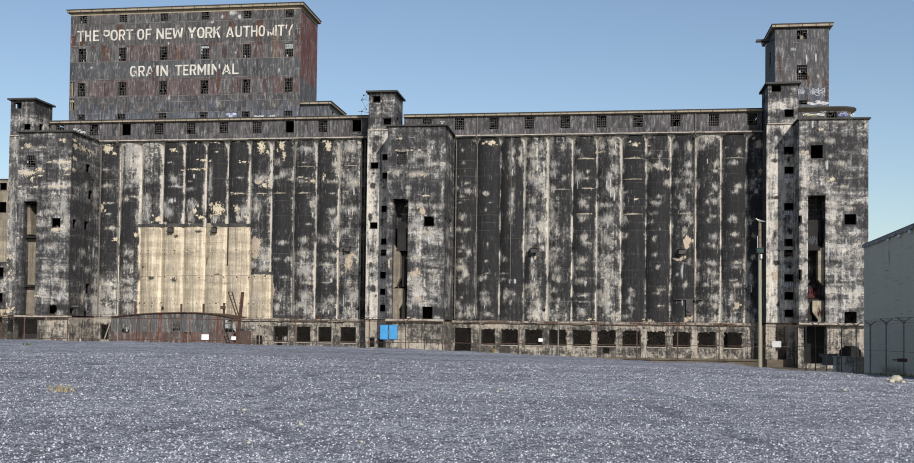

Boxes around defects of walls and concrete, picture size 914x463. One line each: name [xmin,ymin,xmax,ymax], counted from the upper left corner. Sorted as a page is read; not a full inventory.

peeling [18,138,117,188]
leakage [125,144,154,230]
peeling [257,140,286,161]
leakage [322,207,357,242]
leakage [331,141,362,194]
leakage [501,137,589,319]
leakage [598,166,633,317]
leakage [665,162,700,232]
spalling [673,235,694,261]
leakage [253,236,360,331]
leakage [676,255,756,323]